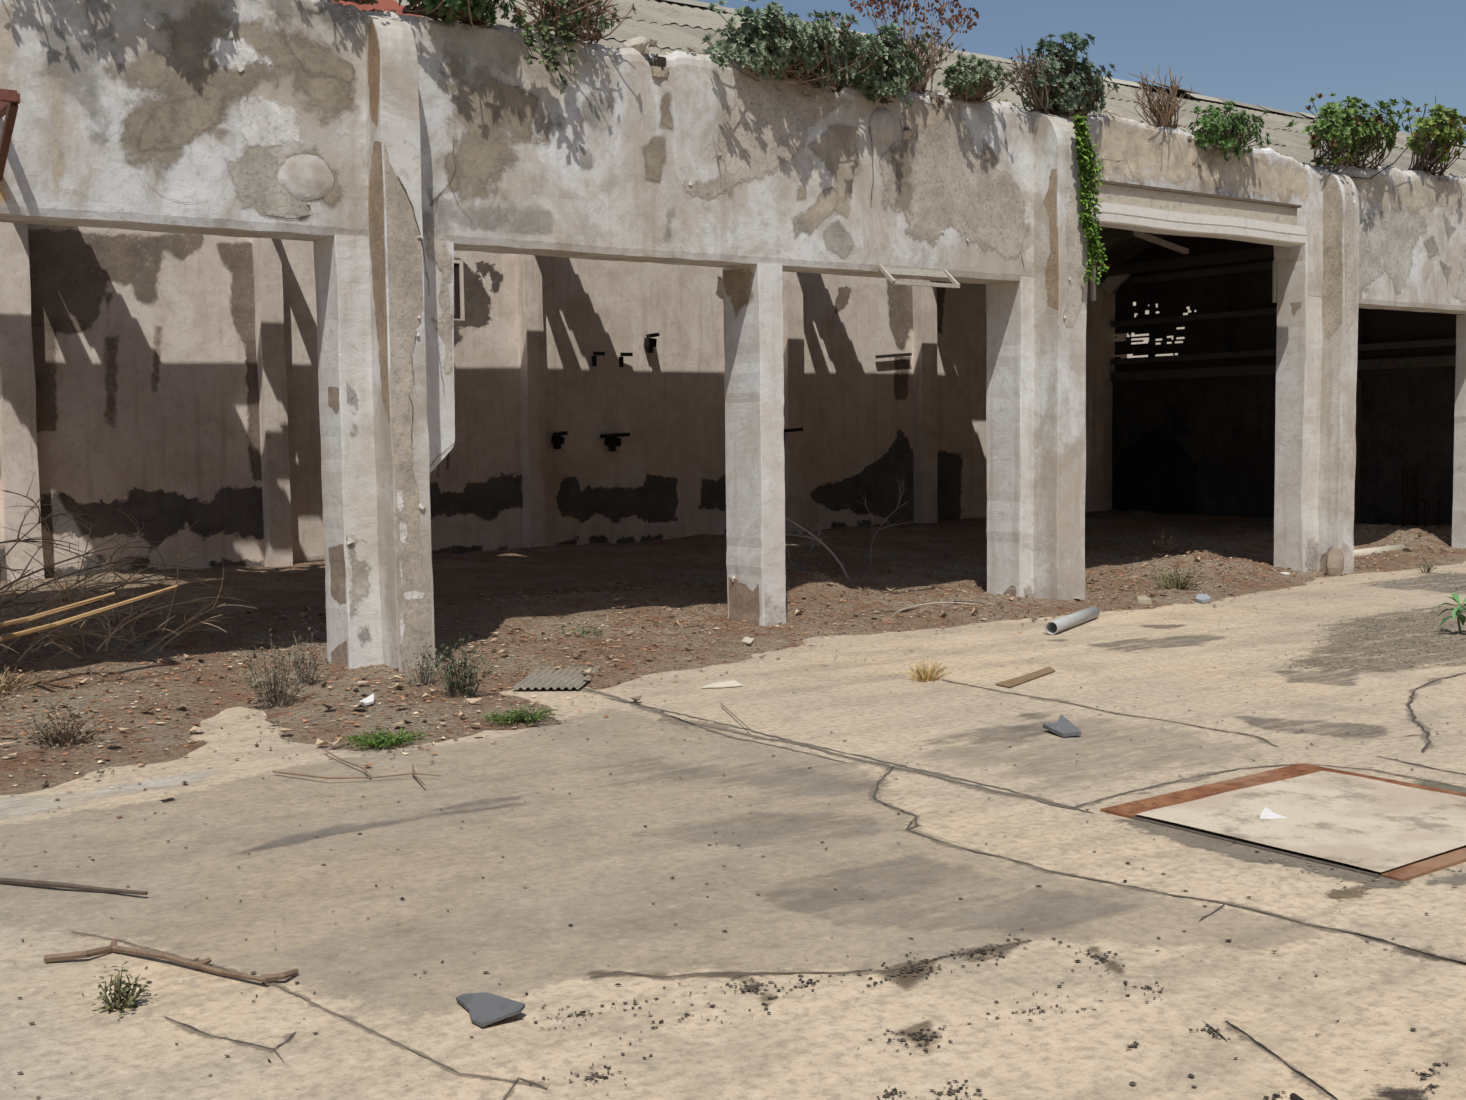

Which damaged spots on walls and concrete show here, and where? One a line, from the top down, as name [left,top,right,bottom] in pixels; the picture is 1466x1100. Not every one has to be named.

peeling [209,31,272,72]
leakage [422,21,592,373]
peeling [683,65,853,202]
peeling [879,93,1030,260]
leakage [28,229,265,578]
peeling [368,141,433,671]
leakage [430,452,523,521]
leakage [698,474,726,511]
crack [579,672,1466,964]
crack [71,931,548,1100]
crack [592,940,1029,980]
crack [1204,1020,1338,1100]